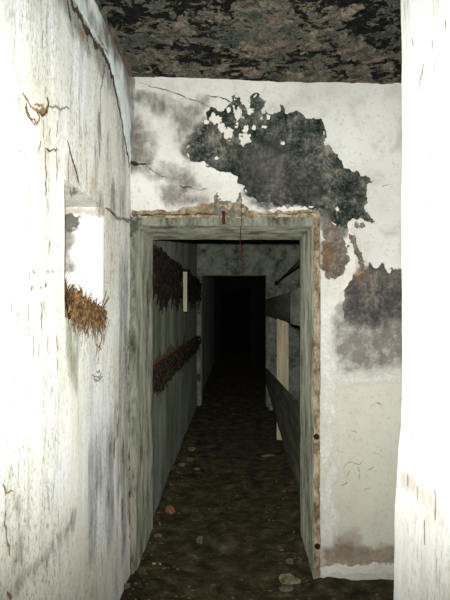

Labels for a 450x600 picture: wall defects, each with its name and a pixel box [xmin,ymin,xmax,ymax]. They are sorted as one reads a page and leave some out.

crack [64,0,207,190]
water stain [124,119,152,170]
water stain [163,173,197,205]
crack [140,83,243,109]
peeling [131,92,377,315]
water stain [319,262,402,549]